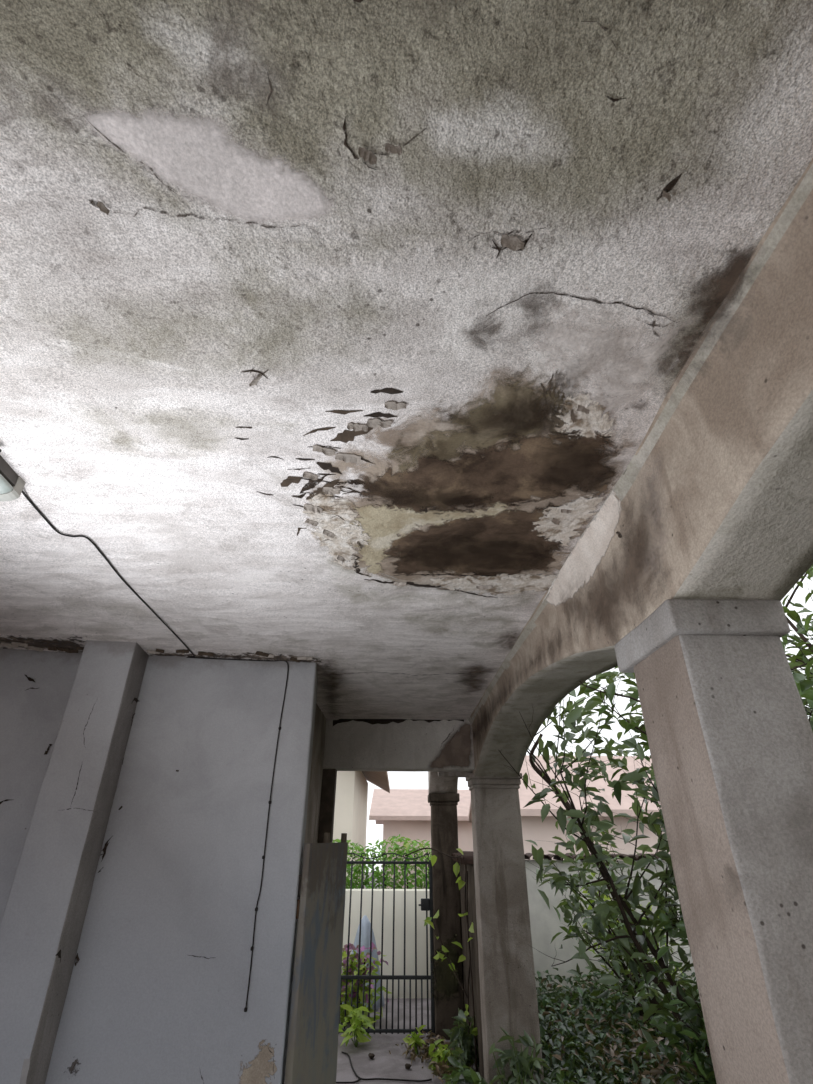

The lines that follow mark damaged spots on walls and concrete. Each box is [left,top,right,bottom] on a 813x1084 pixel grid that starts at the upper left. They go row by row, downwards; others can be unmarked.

leakage [679,250,751,358]
flaking render [259,369,631,606]
peeling [239,1040,277,1084]